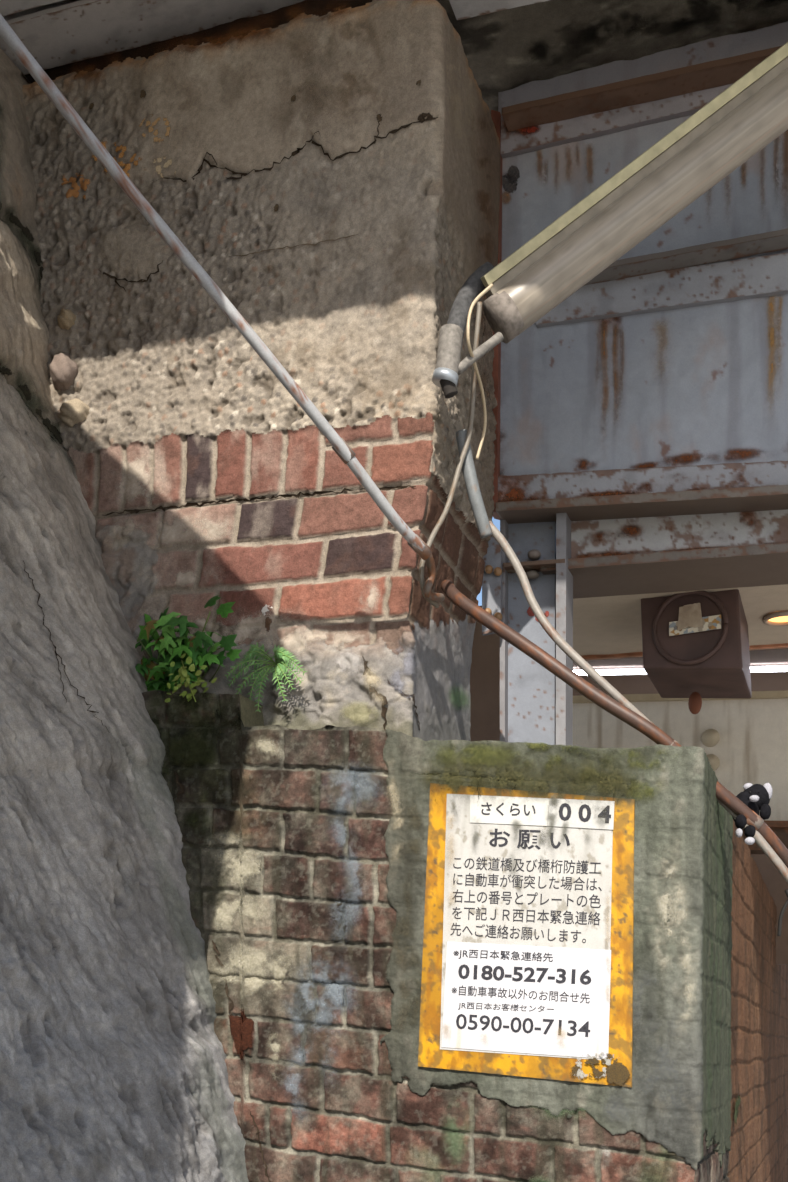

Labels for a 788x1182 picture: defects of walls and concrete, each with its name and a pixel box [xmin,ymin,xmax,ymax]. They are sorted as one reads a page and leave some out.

leakage [673,0,750,30]
spalling [418,113,435,123]
spalling [92,141,176,178]
crack [155,117,438,182]
corrosion [775,130,788,188]
corrosion [601,317,623,409]
corrosion [633,454,701,469]
corrosion [725,449,758,460]
corrosion [498,479,538,502]
corrosion [588,483,651,497]
corrosion [622,525,641,537]
corrosion [577,532,628,558]